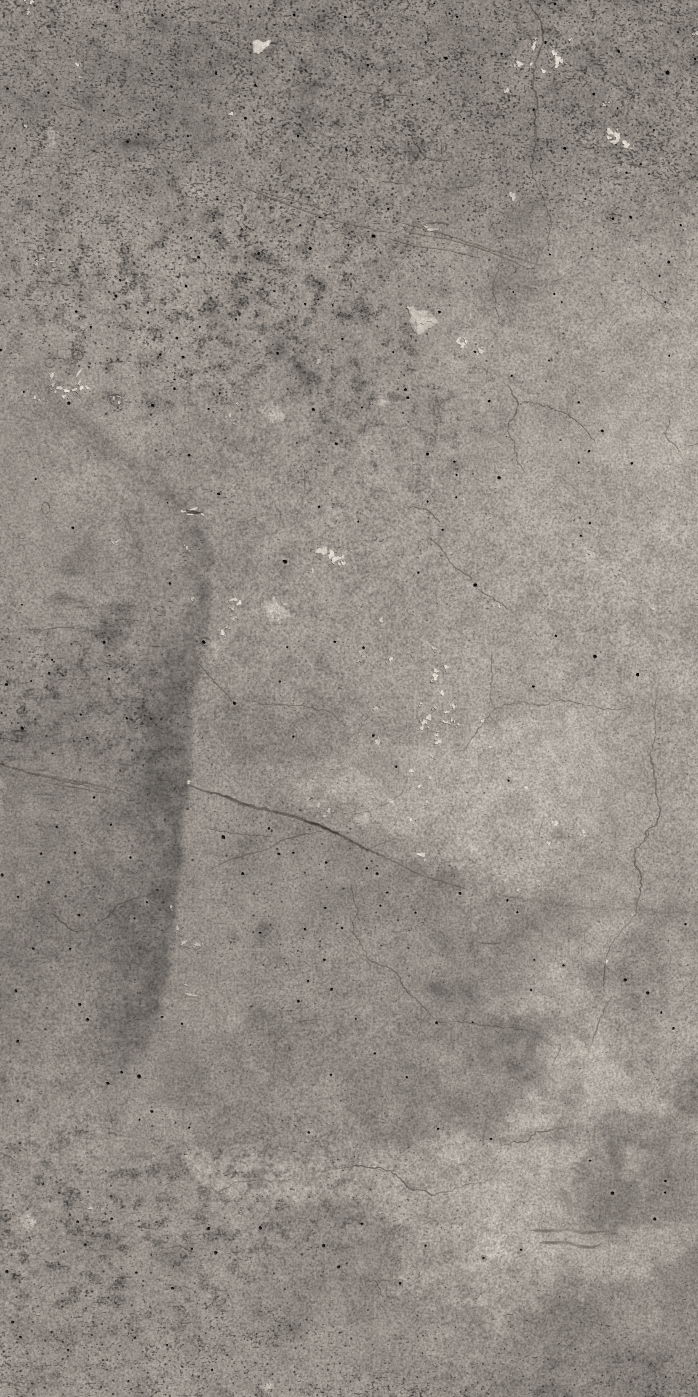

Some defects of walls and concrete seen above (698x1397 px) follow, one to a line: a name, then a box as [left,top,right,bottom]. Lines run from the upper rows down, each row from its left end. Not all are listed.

peeling [405,304,438,336]
damp [0,342,698,1397]
crack [189,658,698,1064]